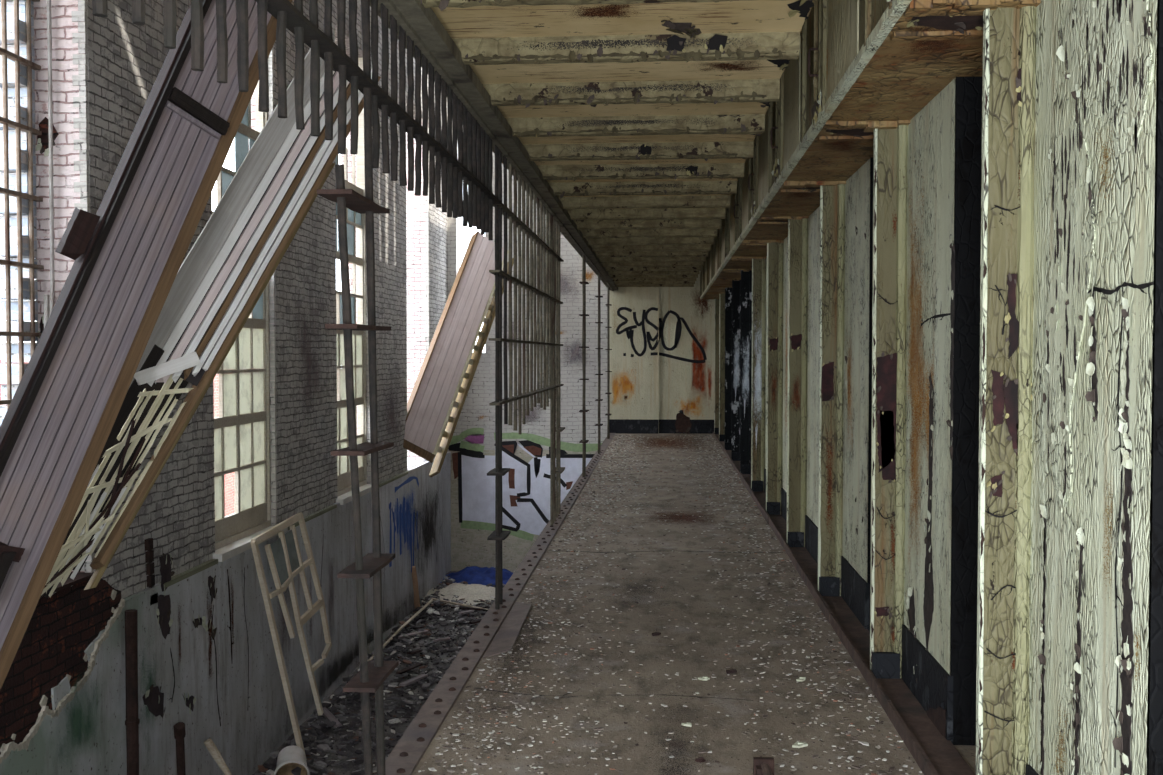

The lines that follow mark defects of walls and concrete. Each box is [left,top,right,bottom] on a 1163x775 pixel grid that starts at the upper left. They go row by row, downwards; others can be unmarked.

peeling [463,20,790,70]
peeling [854,209,877,325]
corrosion [677,323,712,416]
peeling [821,361,836,401]
peeling [847,492,874,593]
peeling [872,338,897,483]
corrosion [890,143,935,597]
peeling [906,240,955,651]
peeling [981,0,1154,775]
crack [1088,268,1154,768]
flaking render [0,579,125,764]
peeling [871,607,892,663]